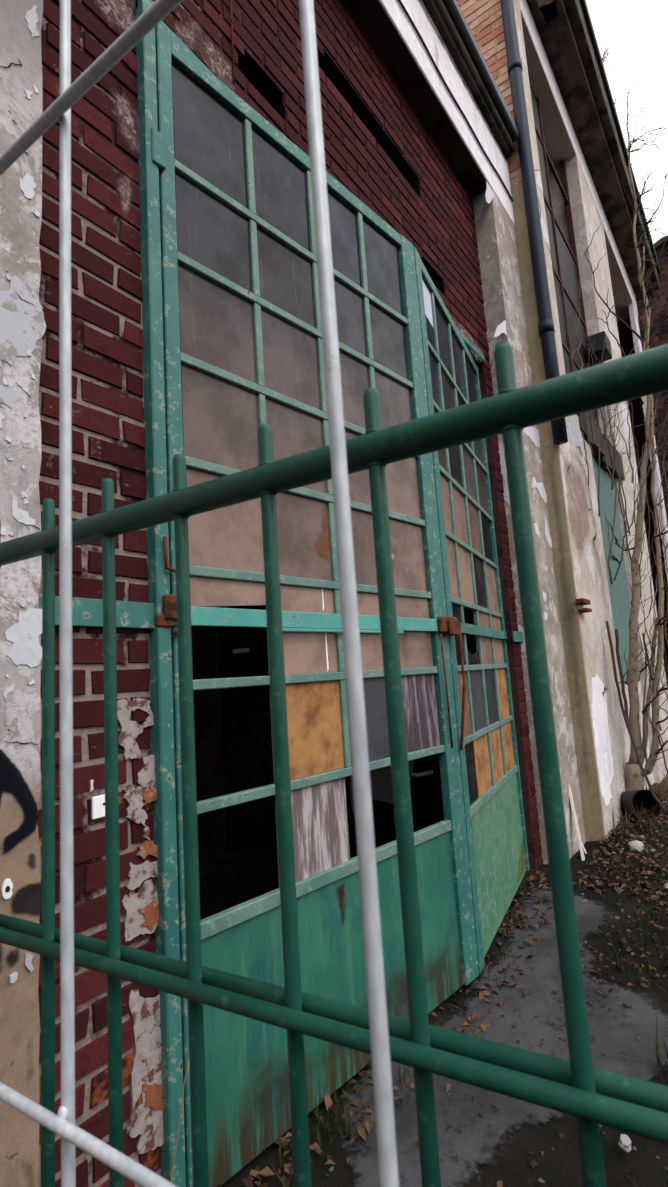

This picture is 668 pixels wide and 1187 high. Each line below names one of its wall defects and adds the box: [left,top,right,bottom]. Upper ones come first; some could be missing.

peeling [25,5,40,38]
peeling [19,173,40,217]
peeling [0,273,46,470]
peeling [1,491,40,536]
spalling [141,788,157,806]
spalling [137,840,158,859]
spalling [138,900,159,930]
spalling [142,1083,164,1110]